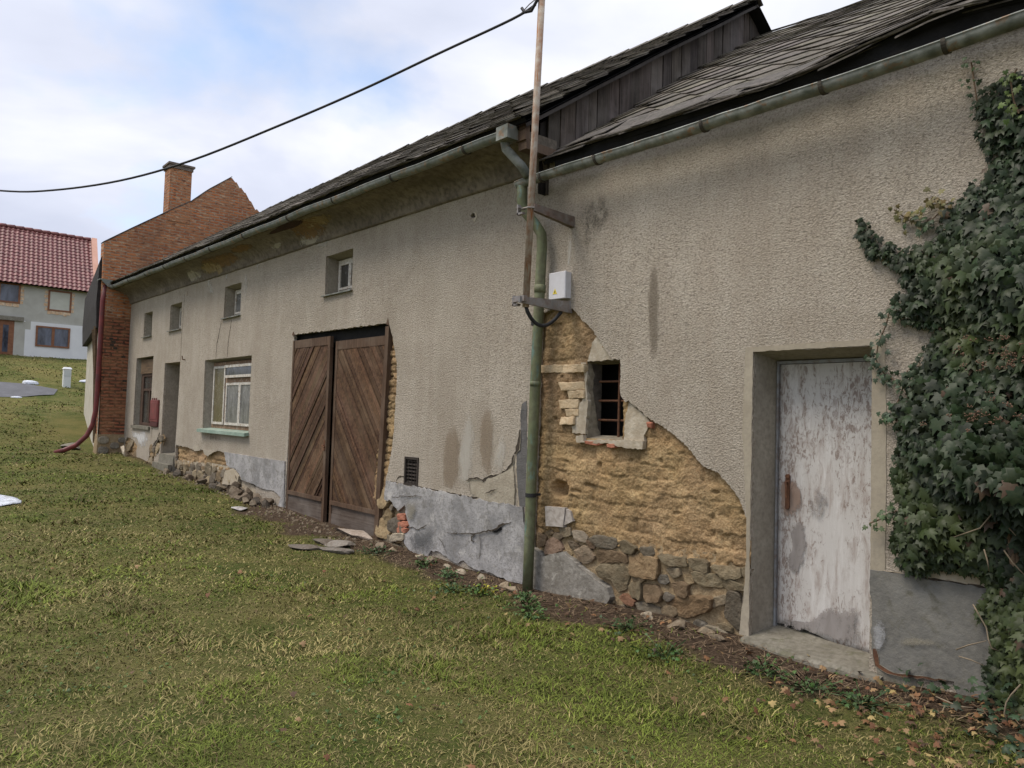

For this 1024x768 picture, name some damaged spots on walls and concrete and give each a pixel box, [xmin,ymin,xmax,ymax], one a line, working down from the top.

leakage [649,273,658,348]
flaking render [175,445,256,495]
flaking render [373,339,409,549]
leakage [444,433,458,486]
crack [391,429,521,499]
leakage [481,413,492,468]
flaking render [533,310,754,636]